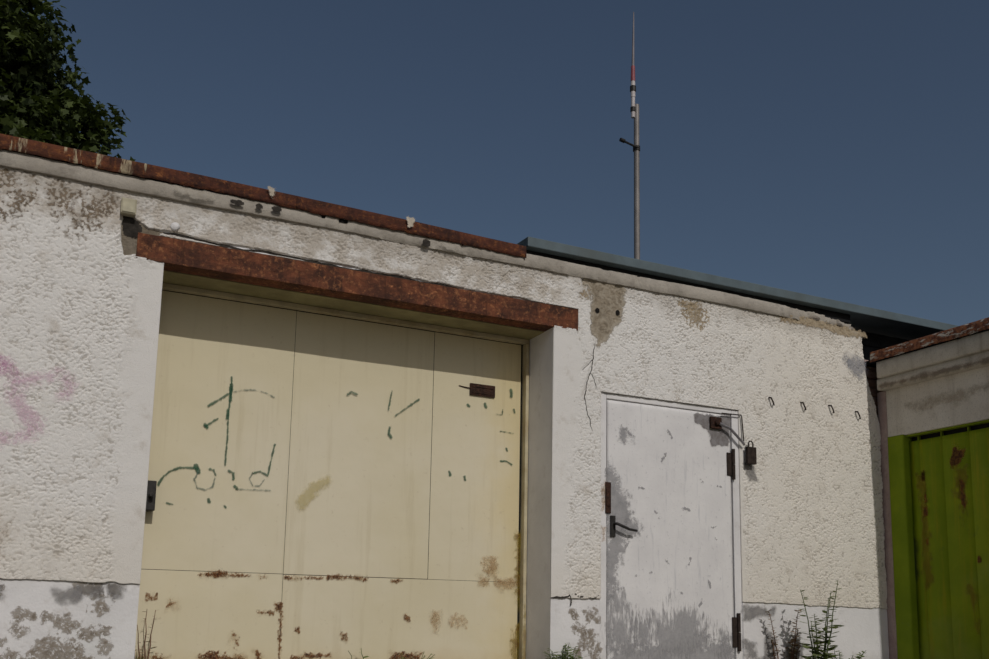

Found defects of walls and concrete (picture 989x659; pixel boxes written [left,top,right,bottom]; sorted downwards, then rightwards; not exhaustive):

spalling [579,279,626,347]
spalling [678,299,710,330]
crack [584,347,596,429]
rust [200,570,261,579]
rust [284,574,367,582]
peeling [569,466,743,659]
peeling [0,582,121,659]
rust [198,633,261,659]
rust [258,602,330,659]
rust [390,651,421,659]